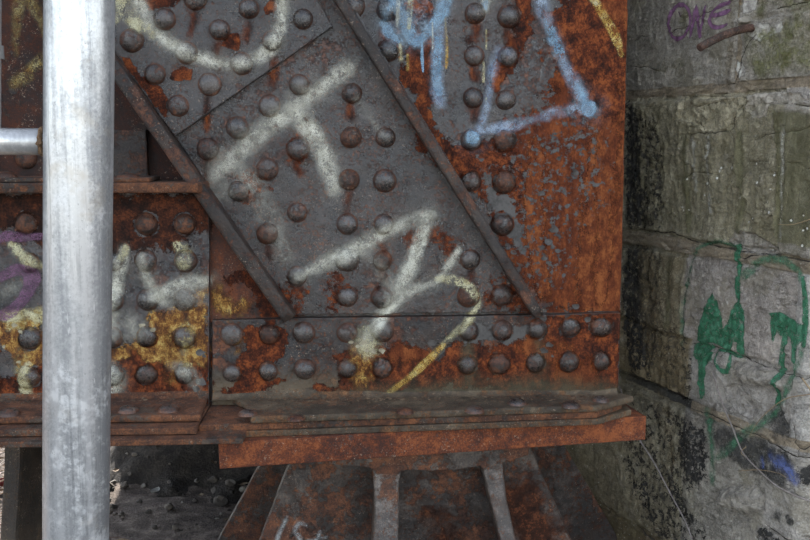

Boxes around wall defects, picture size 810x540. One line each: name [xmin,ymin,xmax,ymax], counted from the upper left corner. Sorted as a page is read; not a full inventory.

rust [312,0,628,392]
peeling [475,89,615,296]
water stain [624,99,664,229]
water stain [768,111,810,251]
rust [0,313,43,394]
water stain [621,240,692,404]
rust [505,477,570,540]
water stain [621,398,810,540]